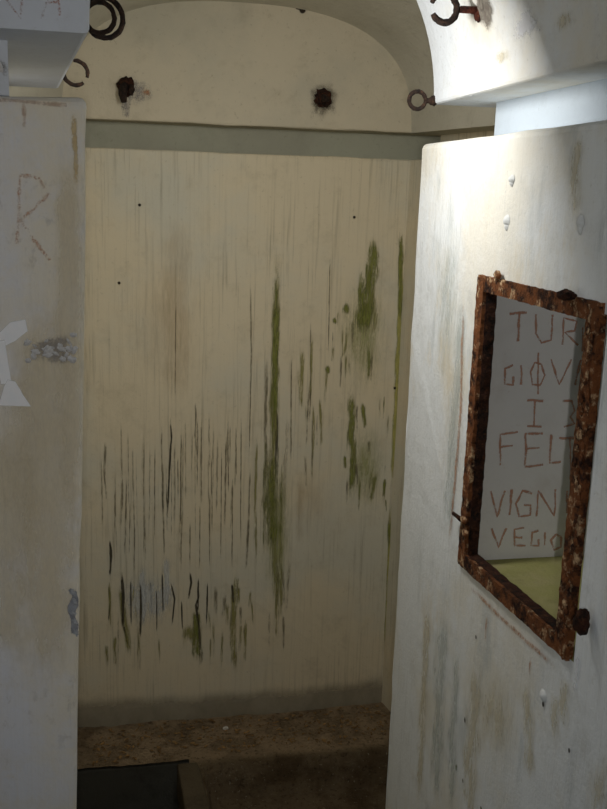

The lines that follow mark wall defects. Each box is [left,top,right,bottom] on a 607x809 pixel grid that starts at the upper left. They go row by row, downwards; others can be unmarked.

corrosion [476,0,492,29]
damp [291,331,322,441]
damp [114,308,283,605]
damp [121,562,208,654]
damp [230,584,247,662]